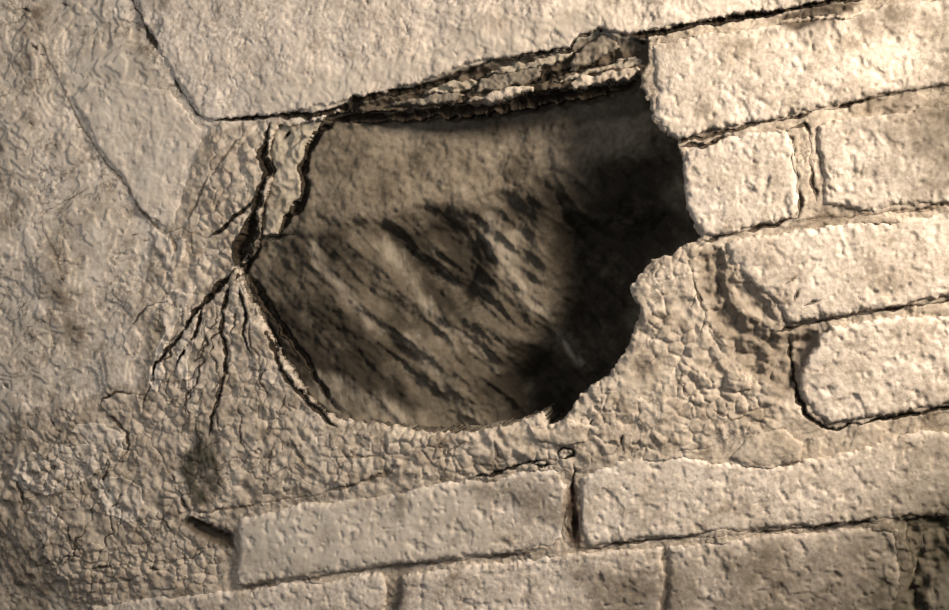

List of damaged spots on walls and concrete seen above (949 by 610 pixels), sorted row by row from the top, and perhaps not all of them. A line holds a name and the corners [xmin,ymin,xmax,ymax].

flaking render [149,228,186,276]
spalling [239,29,650,434]
crack [40,0,861,513]
flaking render [148,285,202,394]
spalling [700,248,818,391]
crack [772,300,949,431]
crack [52,459,135,571]
damp [181,432,222,503]
spalling [183,517,235,549]
crack [416,440,579,543]
spalling [562,487,580,543]
crack [589,520,877,550]